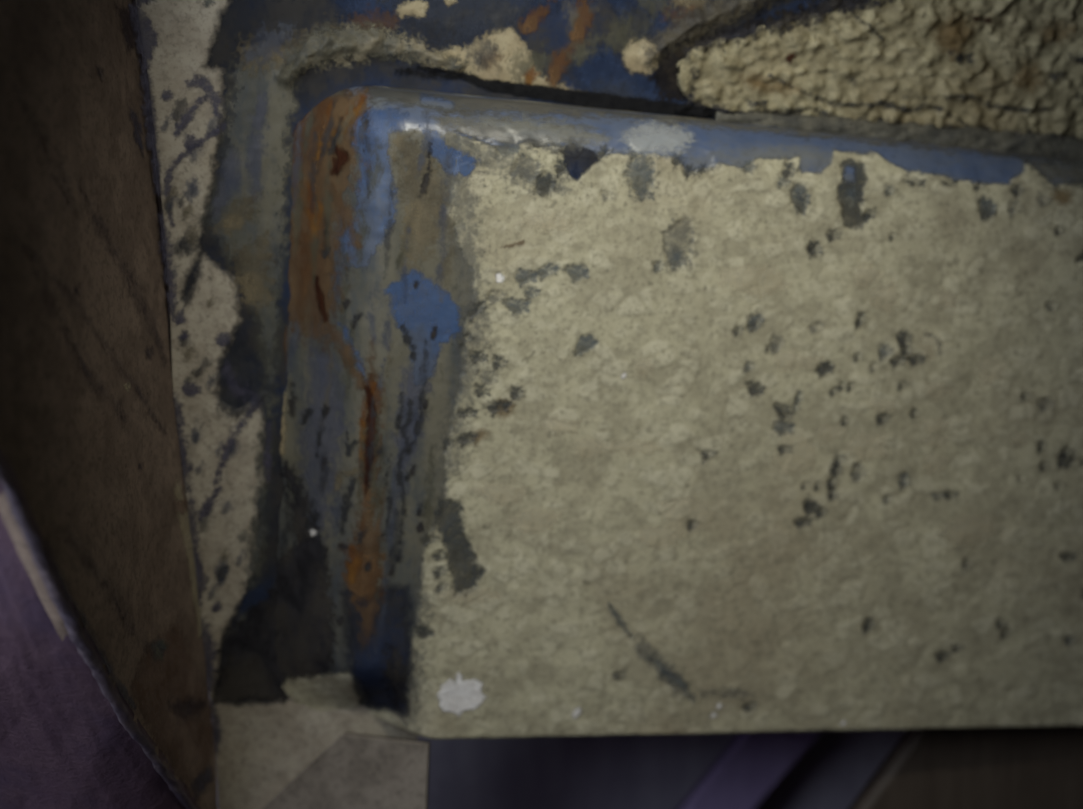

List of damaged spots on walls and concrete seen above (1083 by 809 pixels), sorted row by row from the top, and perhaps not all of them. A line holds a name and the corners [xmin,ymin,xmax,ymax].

peeling [128,0,161,195]
corrosion [525,0,593,87]
corrosion [335,374,385,639]
peeling [158,0,1083,753]